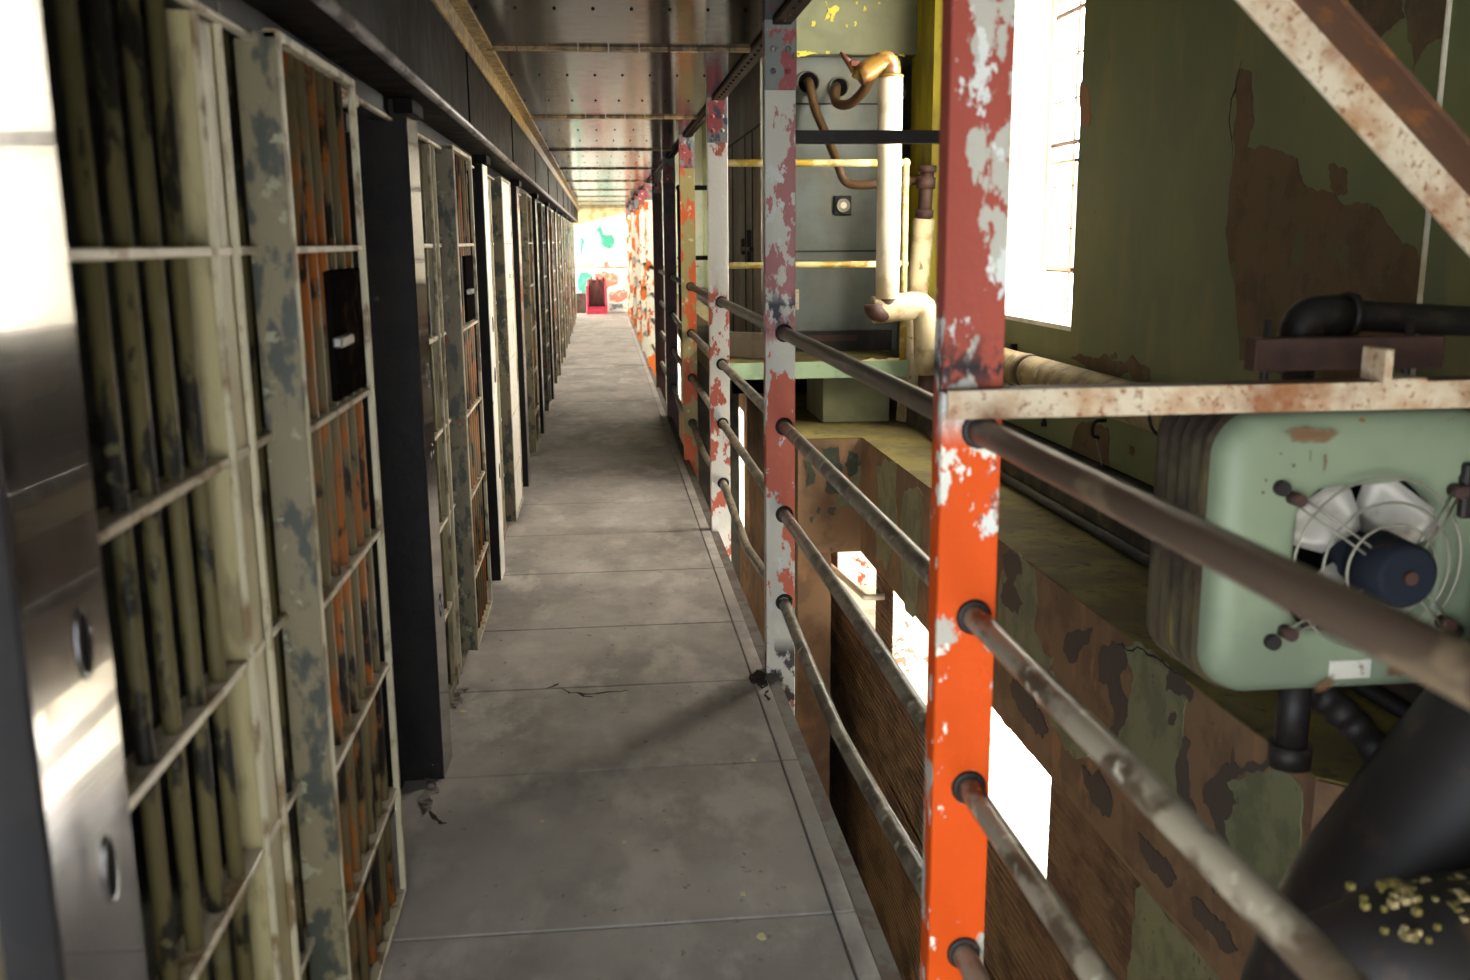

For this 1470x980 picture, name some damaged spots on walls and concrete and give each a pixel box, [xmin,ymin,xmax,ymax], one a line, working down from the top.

peeling [1348,0,1446,72]
peeling [1226,68,1424,361]
peeling [1314,370,1361,379]
peeling [1020,741,1033,774]
peeling [1047,712,1089,759]
peeling [1118,641,1188,794]
peeling [1224,768,1304,890]
peeling [1127,885,1221,980]